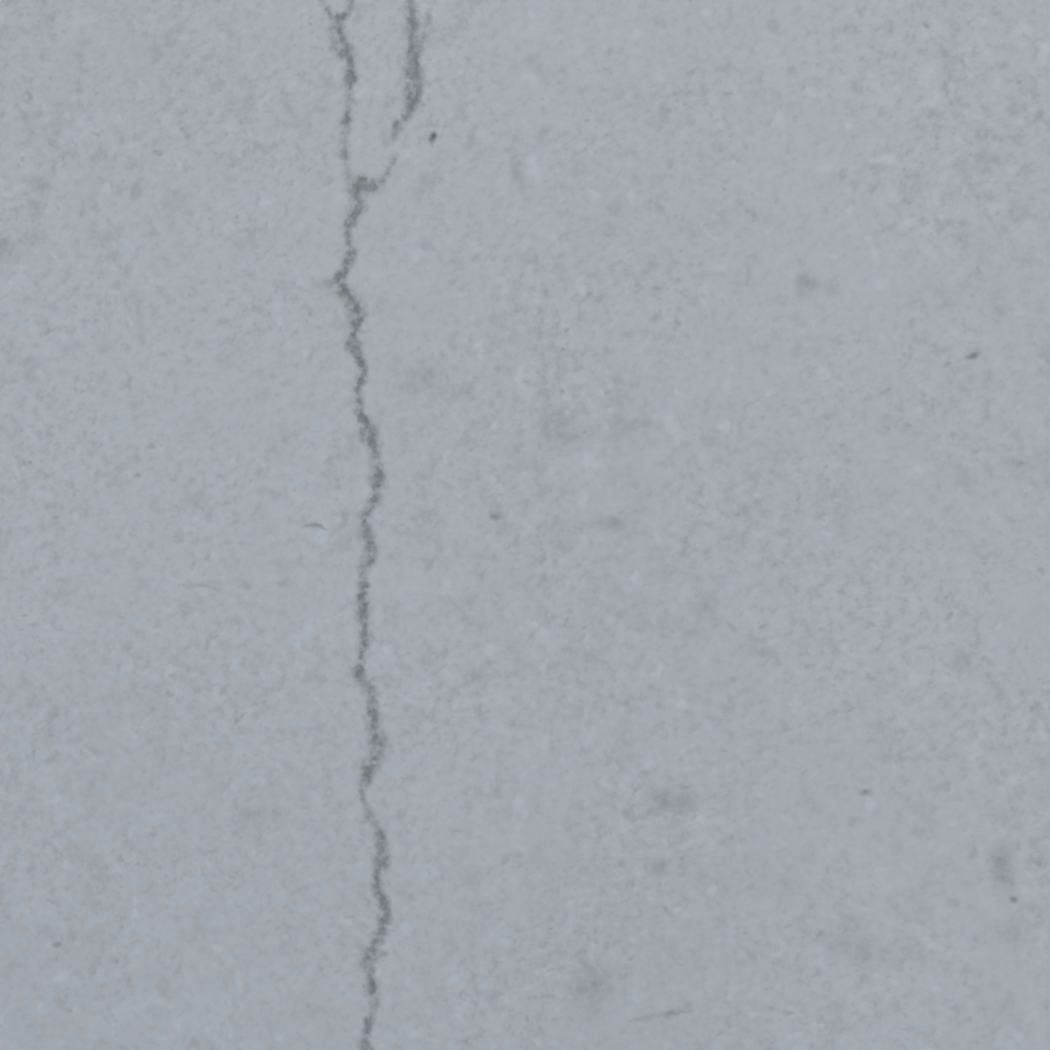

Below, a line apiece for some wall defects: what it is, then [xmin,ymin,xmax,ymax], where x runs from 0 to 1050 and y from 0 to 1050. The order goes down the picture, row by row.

crack [300,0,435,1050]